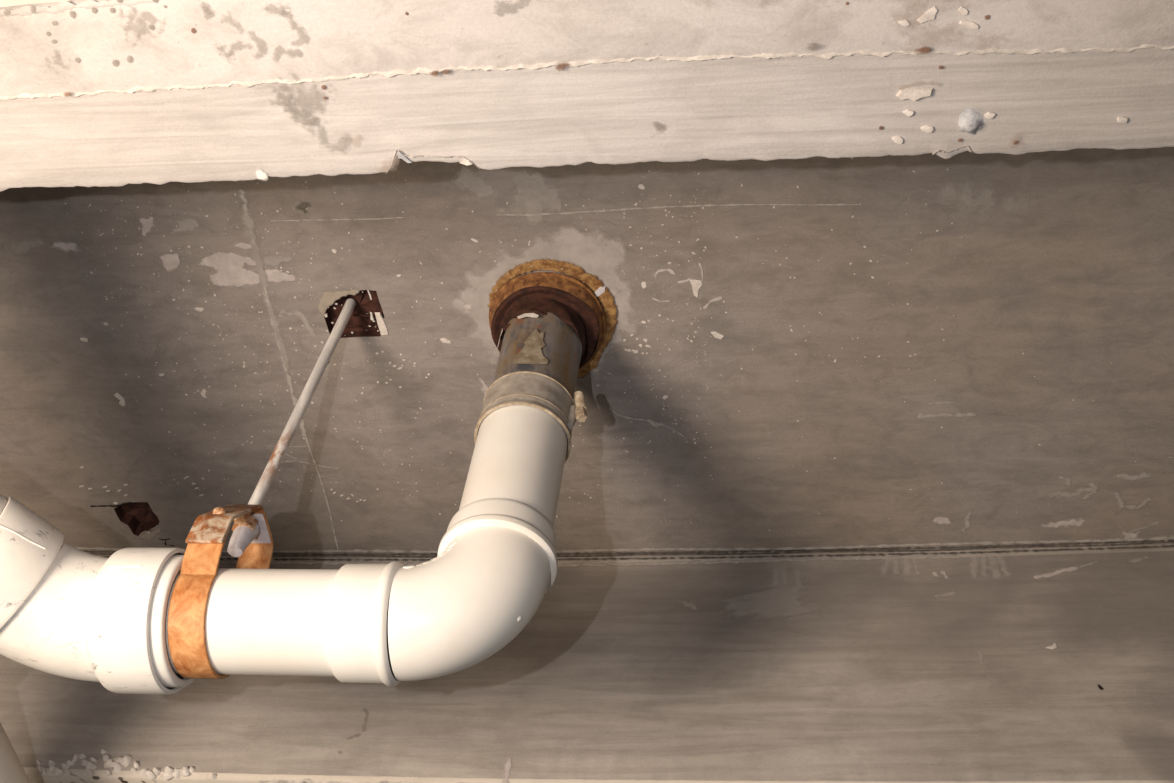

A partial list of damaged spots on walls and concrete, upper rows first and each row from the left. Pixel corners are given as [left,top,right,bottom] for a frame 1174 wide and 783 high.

rust [318,290,389,338]
rust [488,259,617,378]
rust [90,502,161,540]